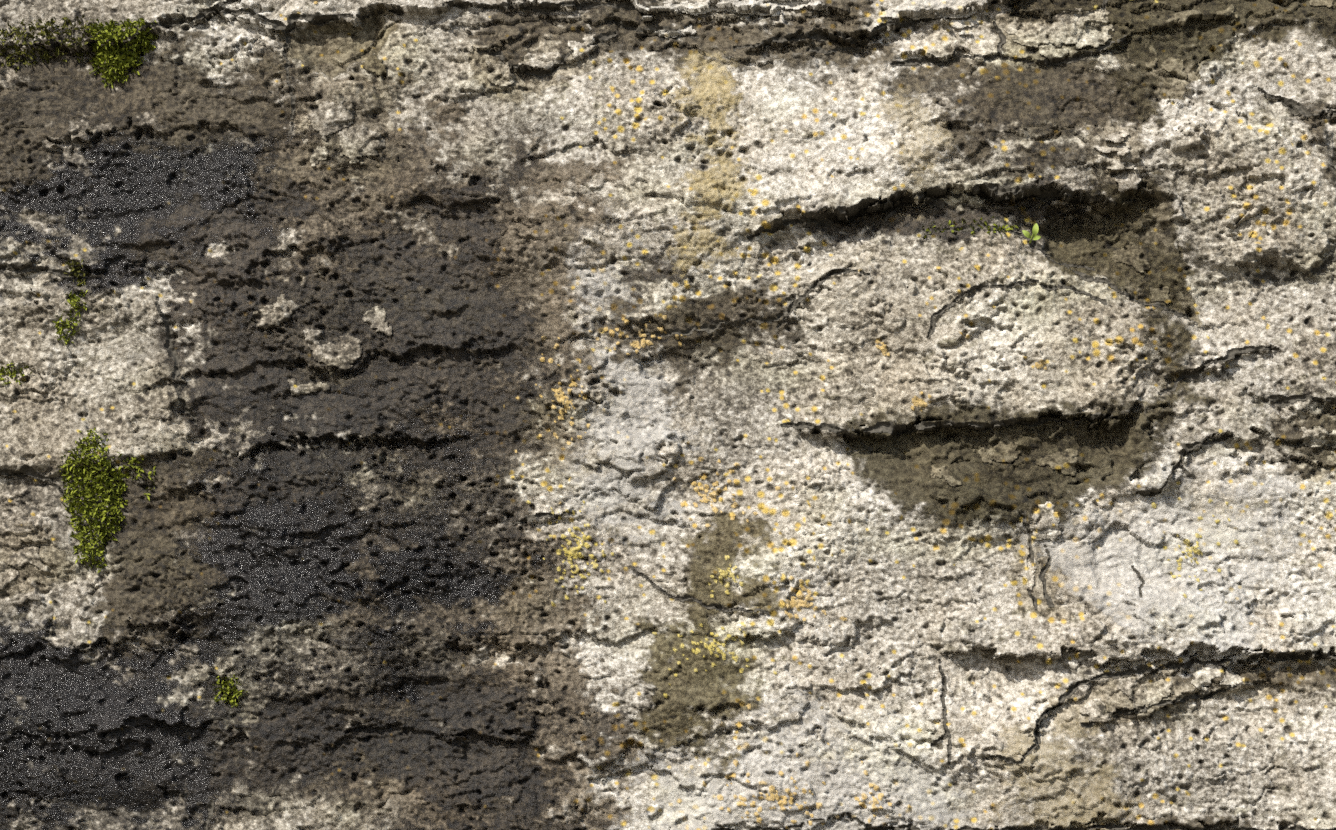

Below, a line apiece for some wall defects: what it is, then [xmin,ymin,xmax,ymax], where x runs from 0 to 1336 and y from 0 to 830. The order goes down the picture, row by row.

water stain [0,30,972,830]
crack [930,660,951,765]
crack [989,651,1336,764]